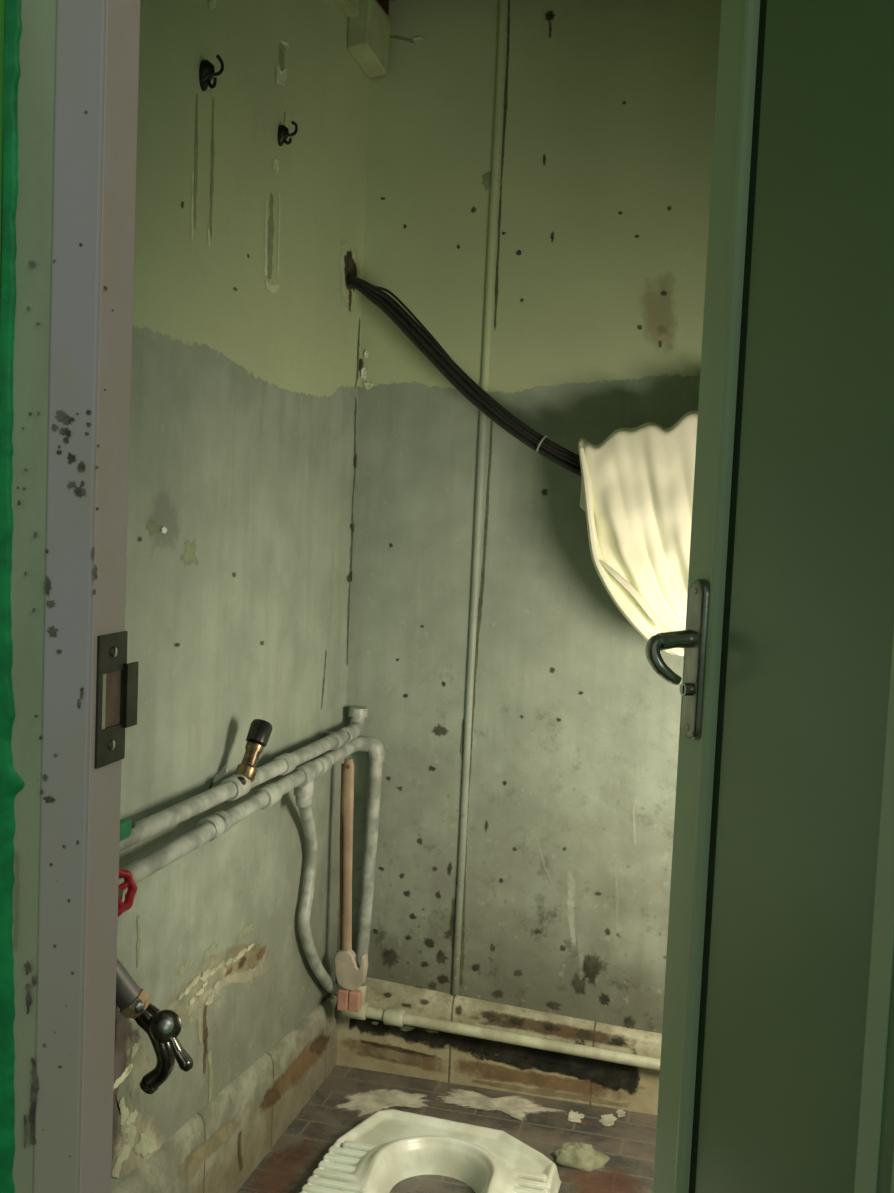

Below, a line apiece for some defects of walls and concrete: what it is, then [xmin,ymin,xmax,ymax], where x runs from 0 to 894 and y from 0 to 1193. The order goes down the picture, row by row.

water stain [560,872,576,951]
peeling [167,923,266,1043]
water stain [384,950,397,966]
water stain [416,931,451,989]
water stain [572,956,602,994]
water stain [349,1018,640,1095]